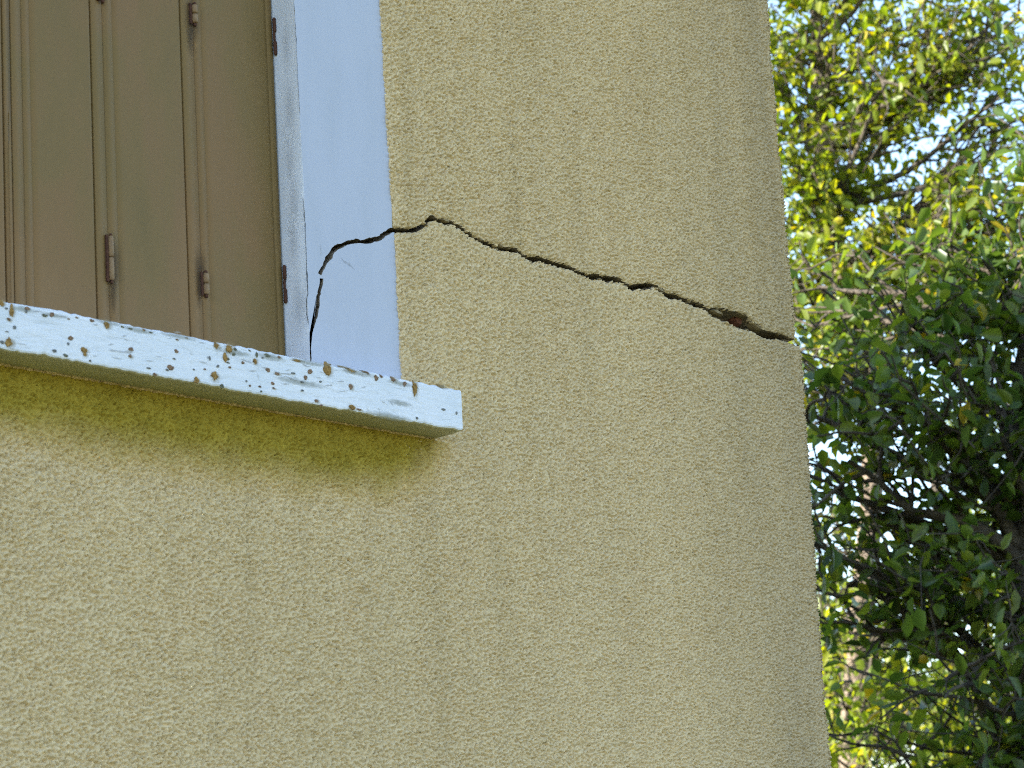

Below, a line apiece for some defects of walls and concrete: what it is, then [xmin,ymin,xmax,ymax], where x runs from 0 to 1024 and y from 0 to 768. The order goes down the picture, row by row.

crack [303,200,799,362]